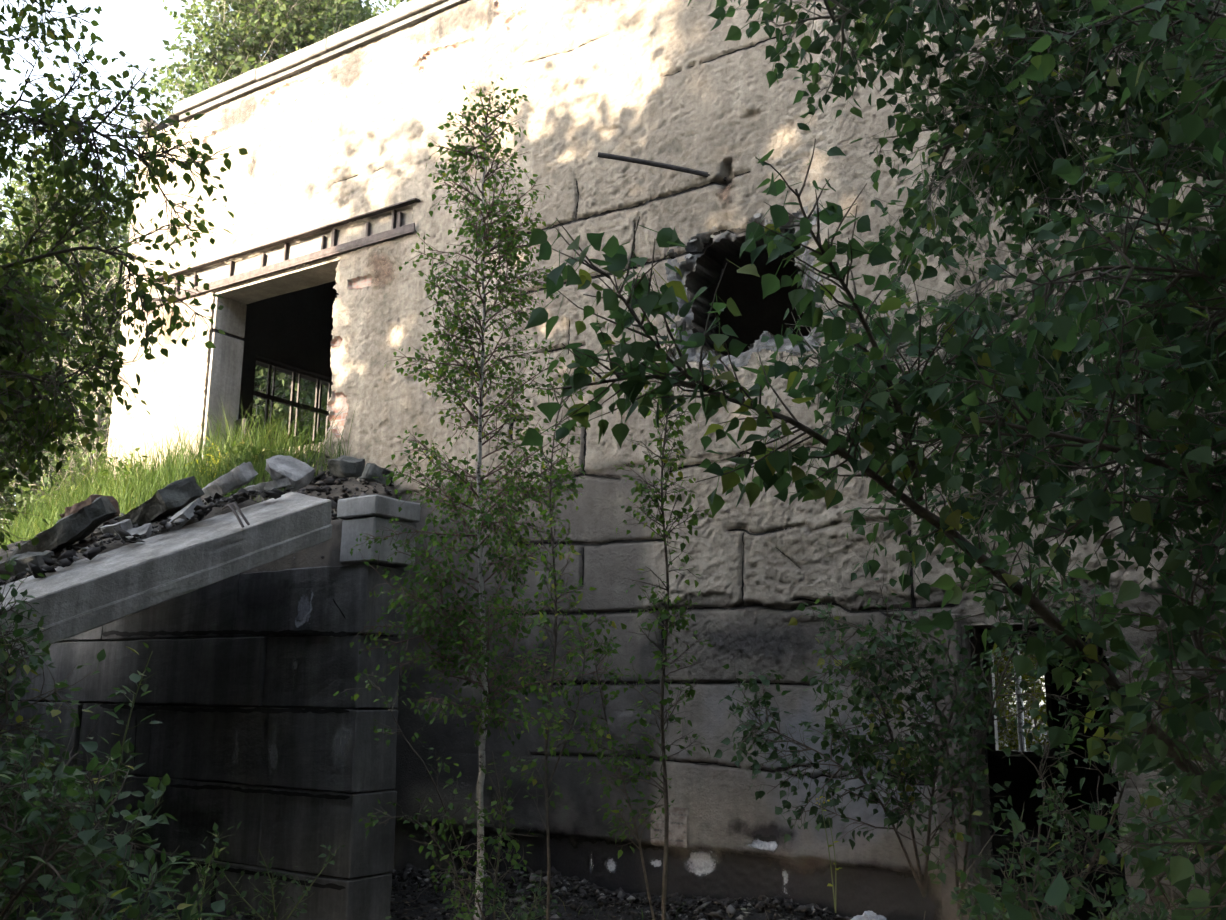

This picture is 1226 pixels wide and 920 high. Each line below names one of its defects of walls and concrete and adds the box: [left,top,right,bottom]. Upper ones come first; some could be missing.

spalling [408,36,479,73]
spalling [258,74,325,110]
spalling [665,200,824,372]
spalling [327,390,349,438]